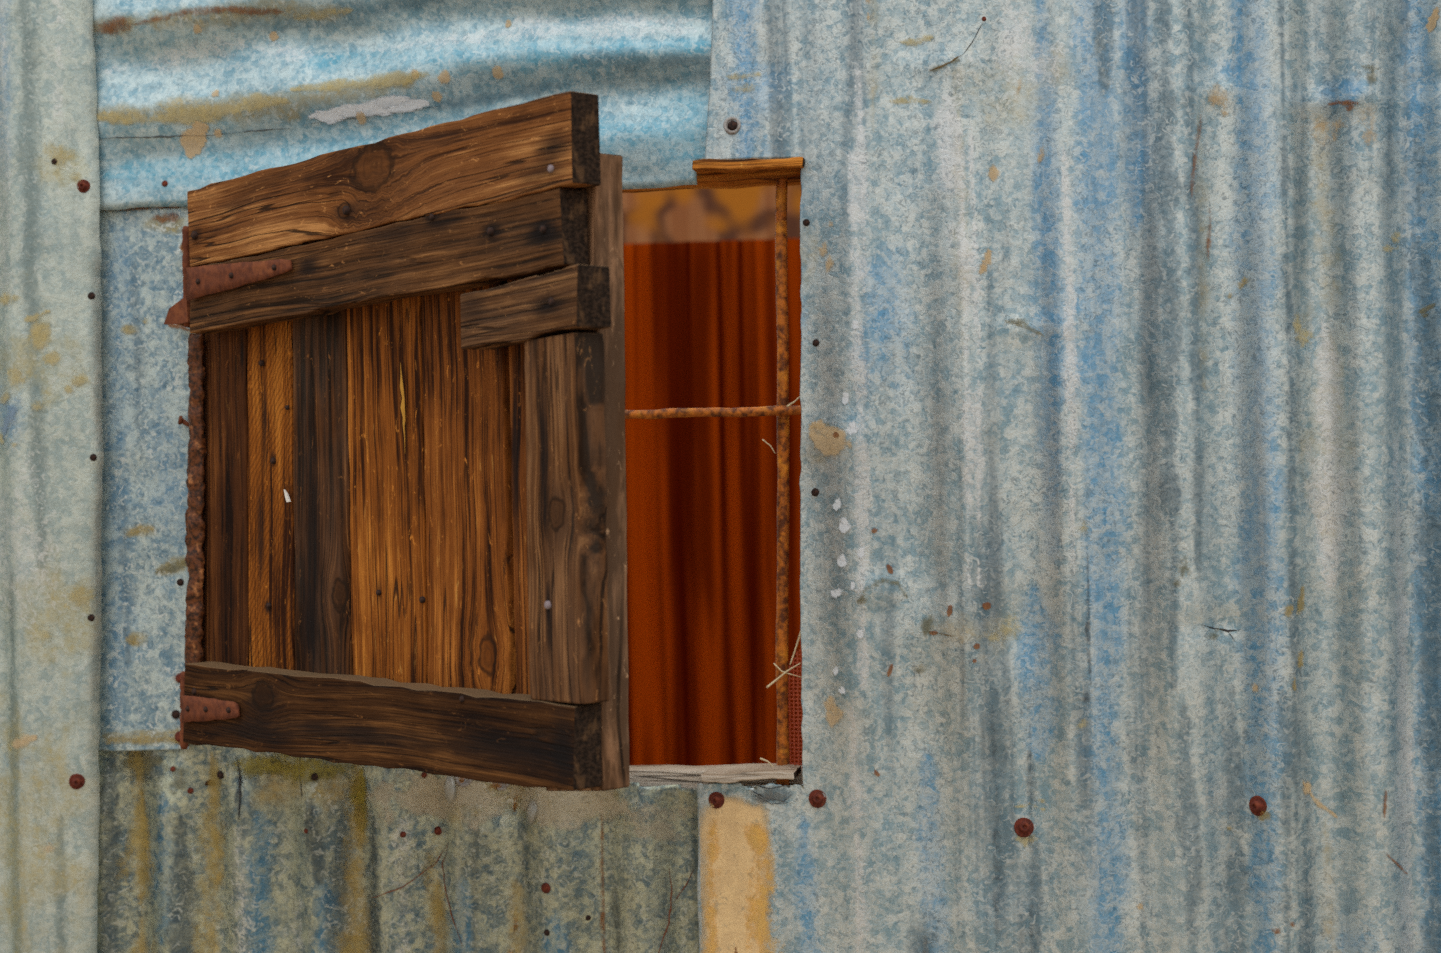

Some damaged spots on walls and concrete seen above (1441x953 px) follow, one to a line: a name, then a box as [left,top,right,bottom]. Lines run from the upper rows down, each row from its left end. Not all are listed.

rust [103,17,126,34]
rust [204,6,280,14]
rust [97,71,424,125]
water stain [234,754,367,832]
rust [700,798,775,953]